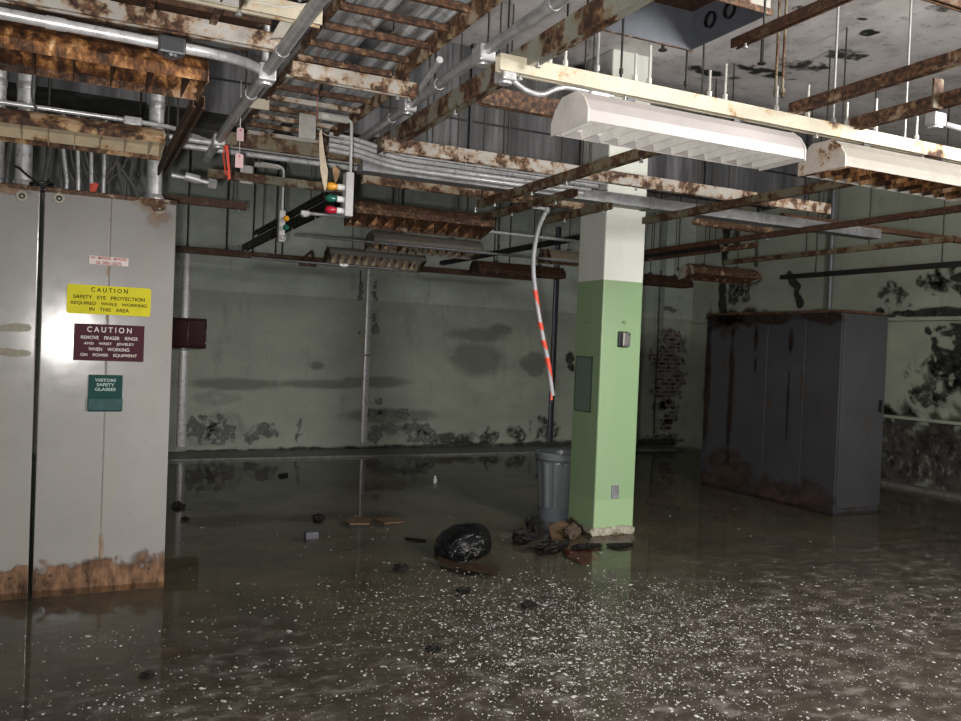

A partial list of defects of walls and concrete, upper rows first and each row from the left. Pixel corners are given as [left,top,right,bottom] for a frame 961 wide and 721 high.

spalling [639,328,687,447]
mould [185,416,571,452]
corrosion [0,536,165,600]